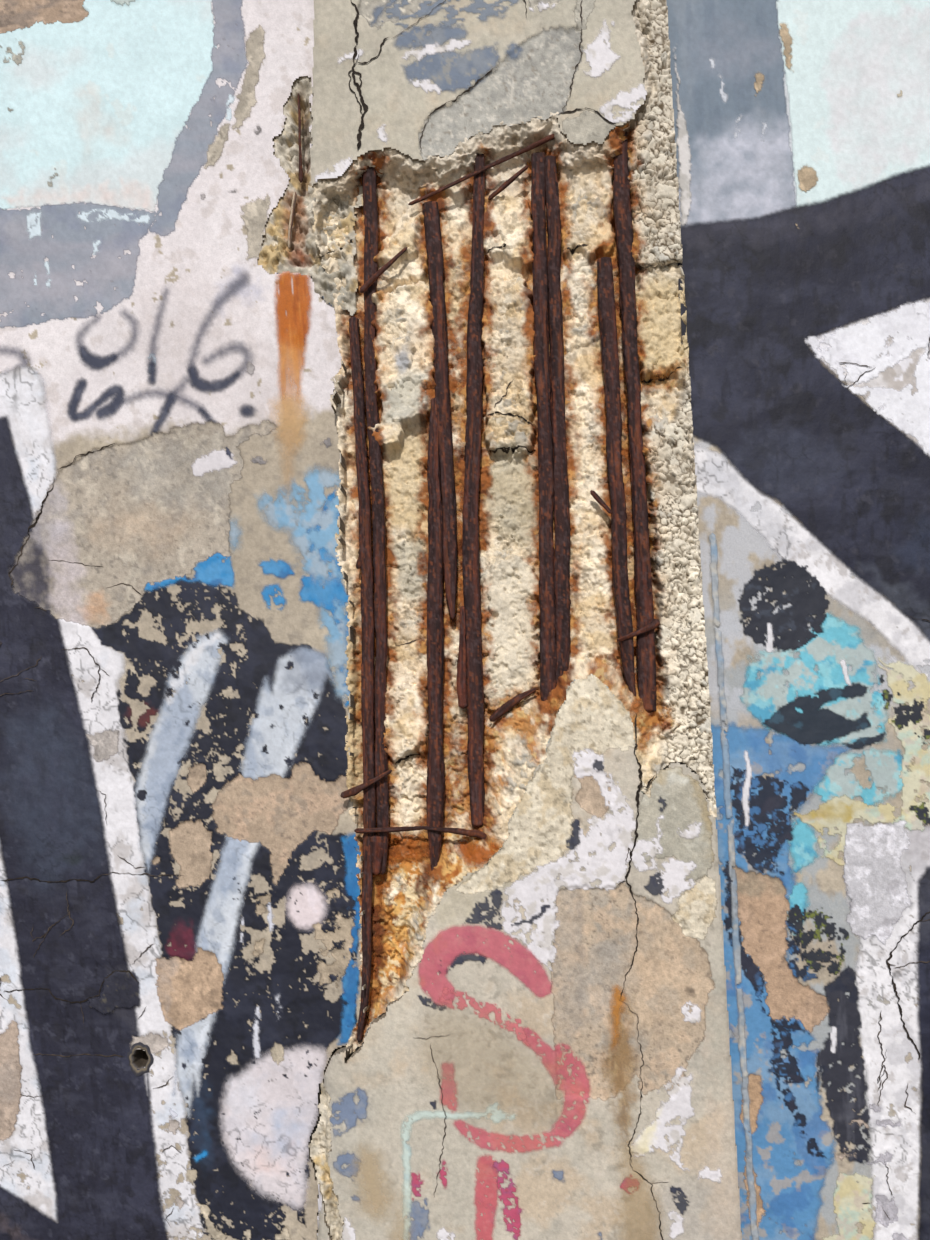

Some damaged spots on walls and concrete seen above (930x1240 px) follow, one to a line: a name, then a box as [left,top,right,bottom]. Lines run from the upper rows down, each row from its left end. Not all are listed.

peeling [0,0,89,65]
crack [348,0,446,150]
crack [559,1,616,124]
corrosion [588,123,645,345]
spalling [152,0,717,1054]
corrosion [342,143,580,1042]
corrosion [589,301,678,750]
peeling [131,948,224,1053]
peeling [551,875,718,1101]
crack [618,714,666,1240]
peeling [732,864,830,1032]
crack [877,912,930,1112]